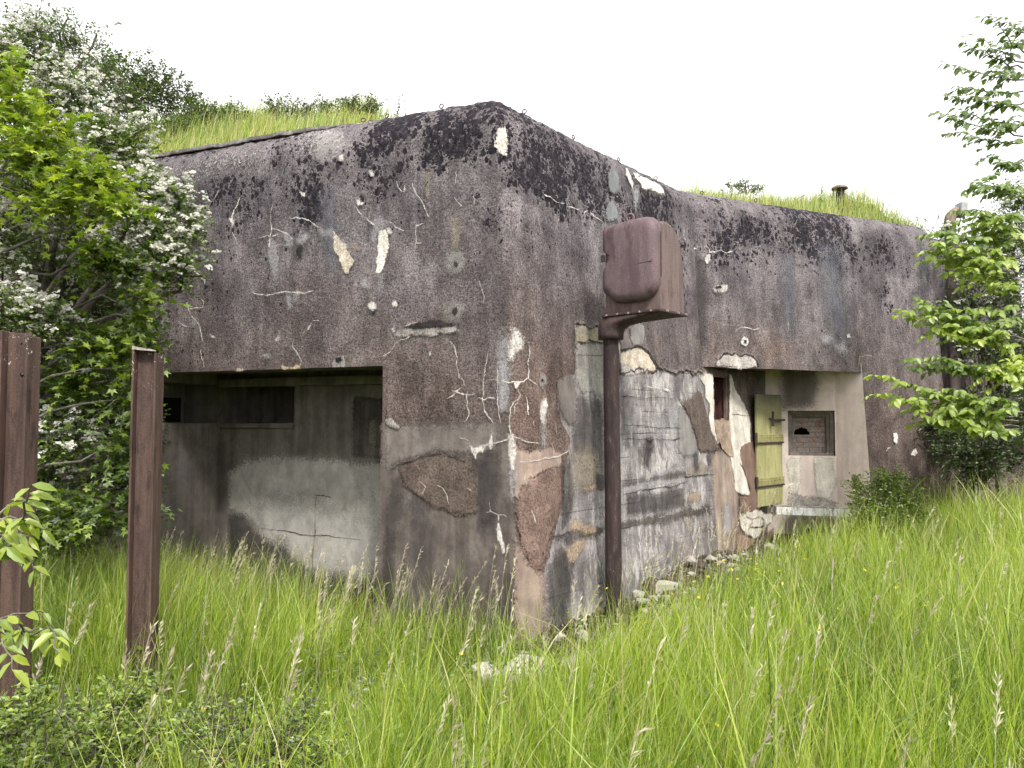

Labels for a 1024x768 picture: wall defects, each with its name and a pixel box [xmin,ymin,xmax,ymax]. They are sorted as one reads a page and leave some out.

leakage [295,129,346,161]
spalling [492,126,508,156]
crack [202,190,319,310]
spalling [333,231,356,274]
spalling [372,217,392,292]
crack [383,336,557,459]
peeling [251,319,606,653]
peeling [619,342,774,600]
crack [487,503,505,554]